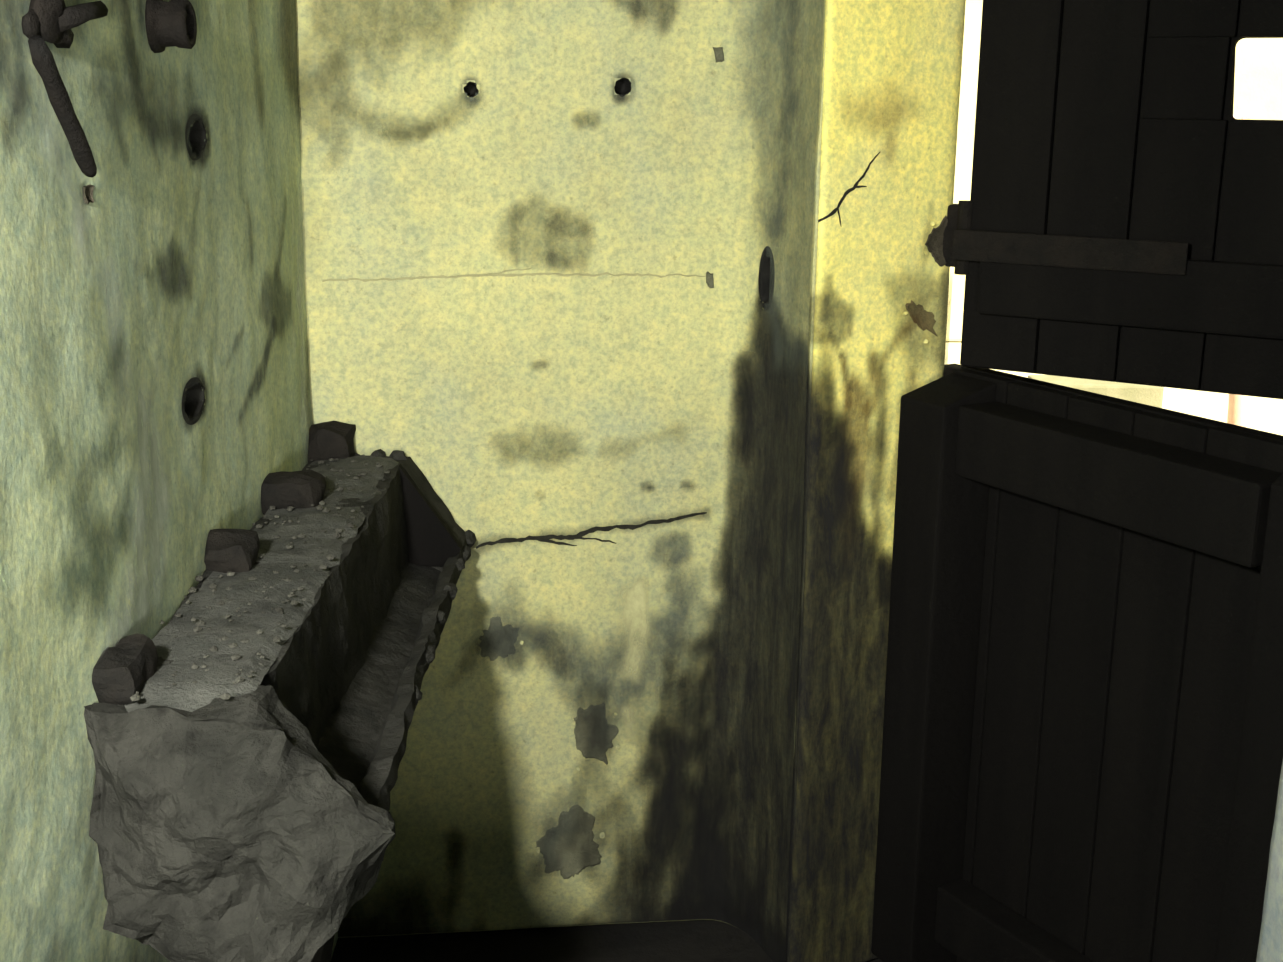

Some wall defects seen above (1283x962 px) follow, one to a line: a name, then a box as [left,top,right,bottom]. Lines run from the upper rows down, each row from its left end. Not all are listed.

crack [818,152,880,225]
crack [476,512,707,549]
damp [496,209,892,962]
damp [338,891,437,937]